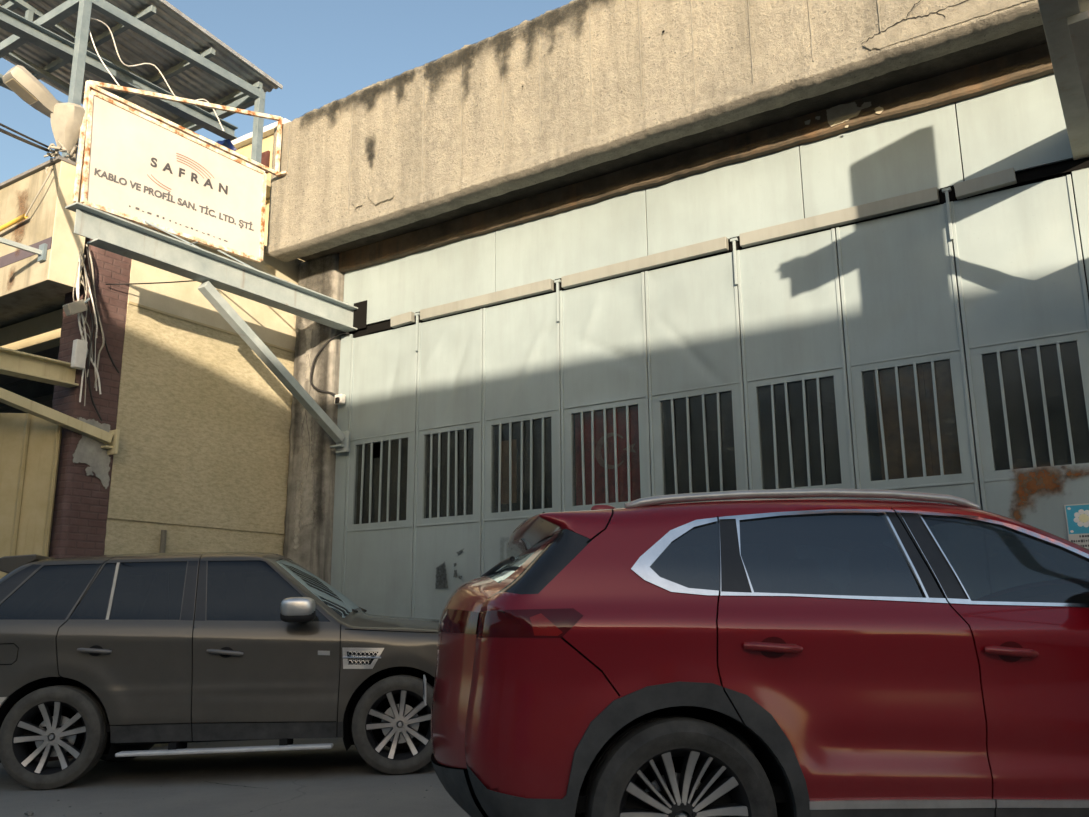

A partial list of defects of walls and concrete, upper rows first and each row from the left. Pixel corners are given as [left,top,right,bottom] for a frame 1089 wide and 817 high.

damp [300,0,607,125]
peeling [804,102,884,128]
peeling [73,417,111,489]
corrosion [1012,466,1089,521]